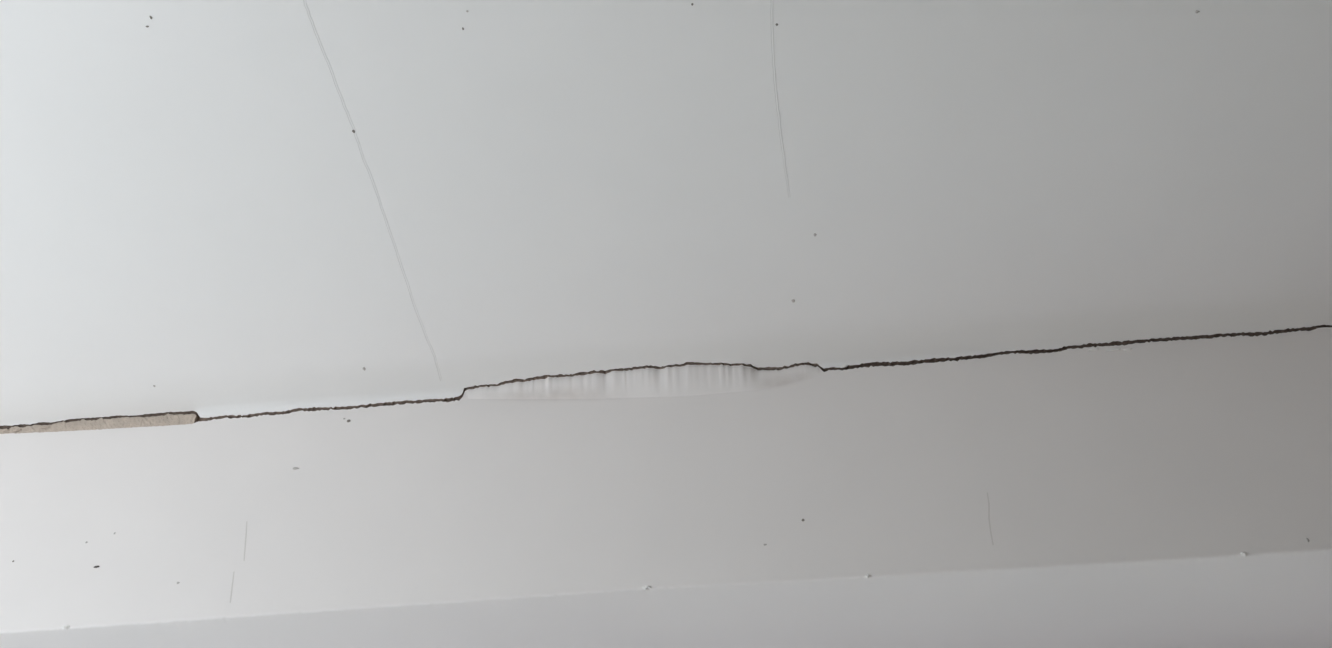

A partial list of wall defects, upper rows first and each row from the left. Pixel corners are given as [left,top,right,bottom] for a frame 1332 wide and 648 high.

crack [197,0,1332,422]
spalling [0,411,199,434]